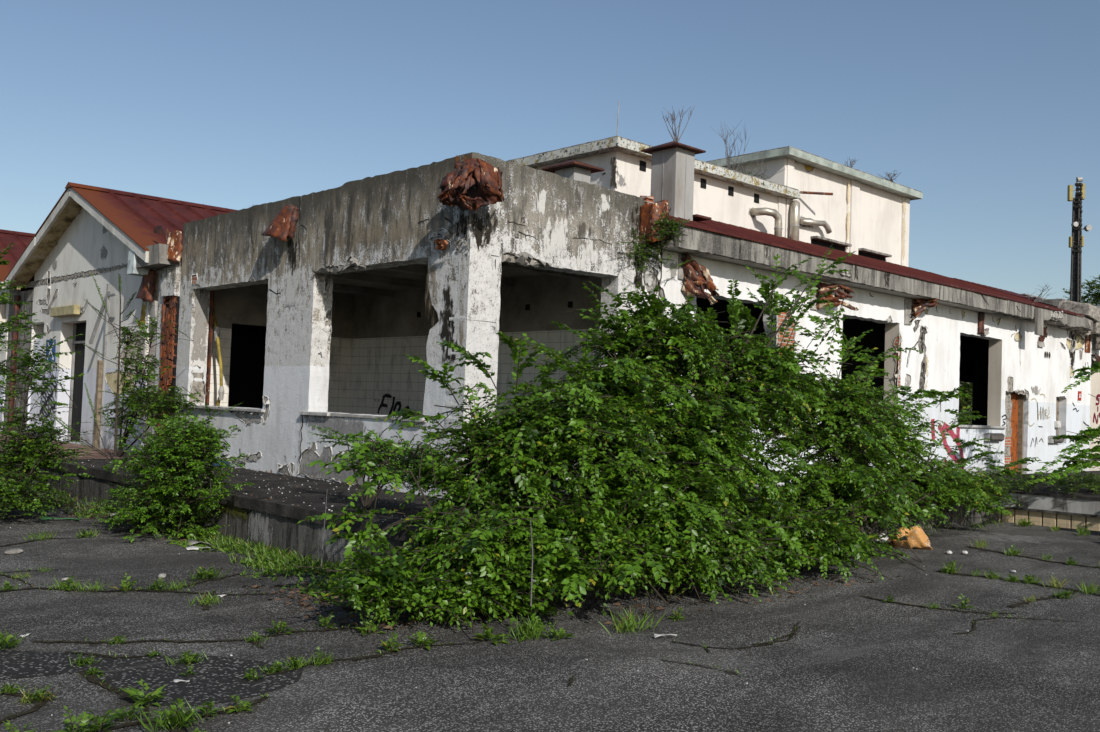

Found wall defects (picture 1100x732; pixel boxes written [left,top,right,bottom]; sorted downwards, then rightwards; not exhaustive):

water stain [600,157,626,212]
corrosion [153,226,183,262]
water stain [454,210,501,252]
water stain [535,189,596,270]
water stain [427,264,457,365]
flaking render [776,311,796,356]
flaking render [225,395,270,428]
flaking render [220,451,262,465]
flaking render [277,442,364,486]
crack [0,537,269,610]
crack [862,546,1100,635]
crack [32,621,485,732]